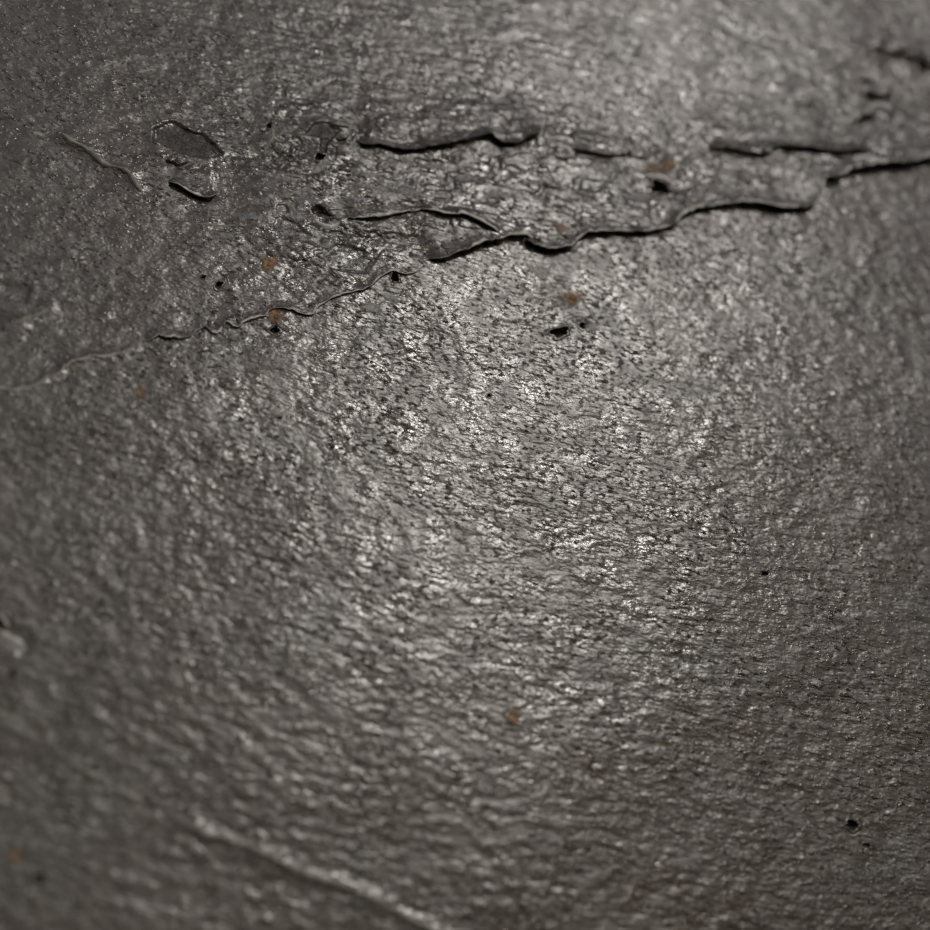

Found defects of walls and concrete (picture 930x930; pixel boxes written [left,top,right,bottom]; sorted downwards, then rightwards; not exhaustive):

spalling [865,39,930,149]
peeling [310,122,541,176]
peeling [706,134,873,153]
peeling [168,177,217,198]
spalling [313,207,344,220]
crack [0,710,146,803]
crack [171,815,438,930]